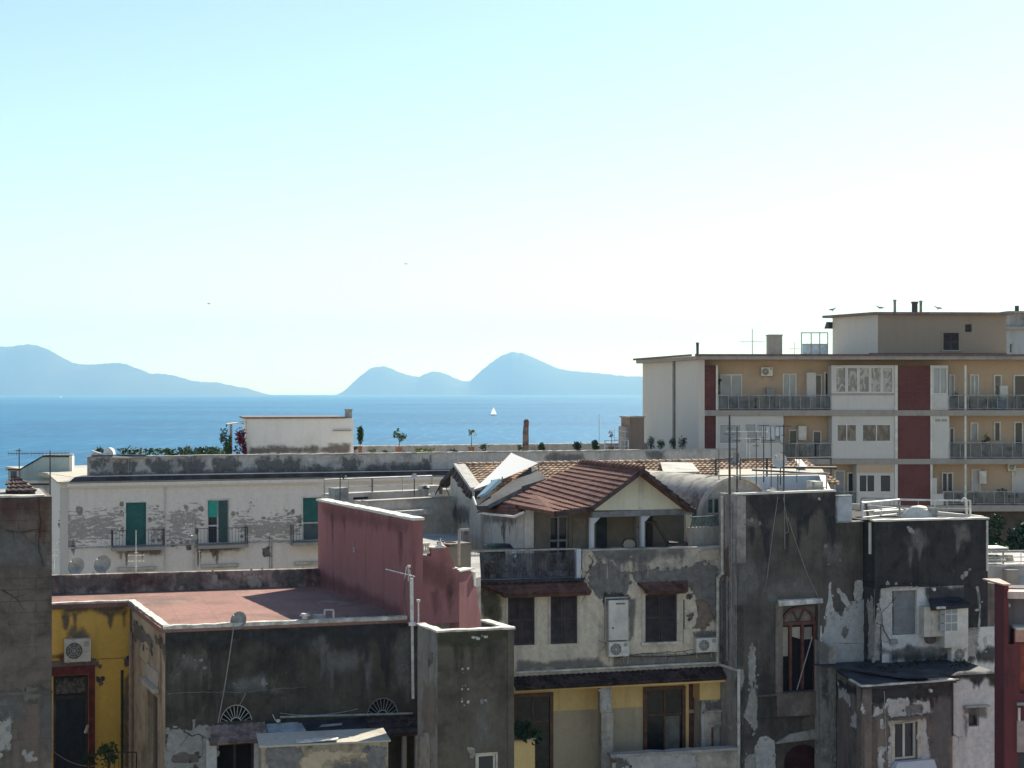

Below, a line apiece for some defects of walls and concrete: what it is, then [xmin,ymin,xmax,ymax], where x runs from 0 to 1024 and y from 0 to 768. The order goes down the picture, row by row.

damp [90,443,432,475]
flaking render [58,501,127,548]
flaking render [145,502,204,550]
spalling [580,549,776,768]
flaking render [820,580,933,768]
flaking render [164,724,220,768]